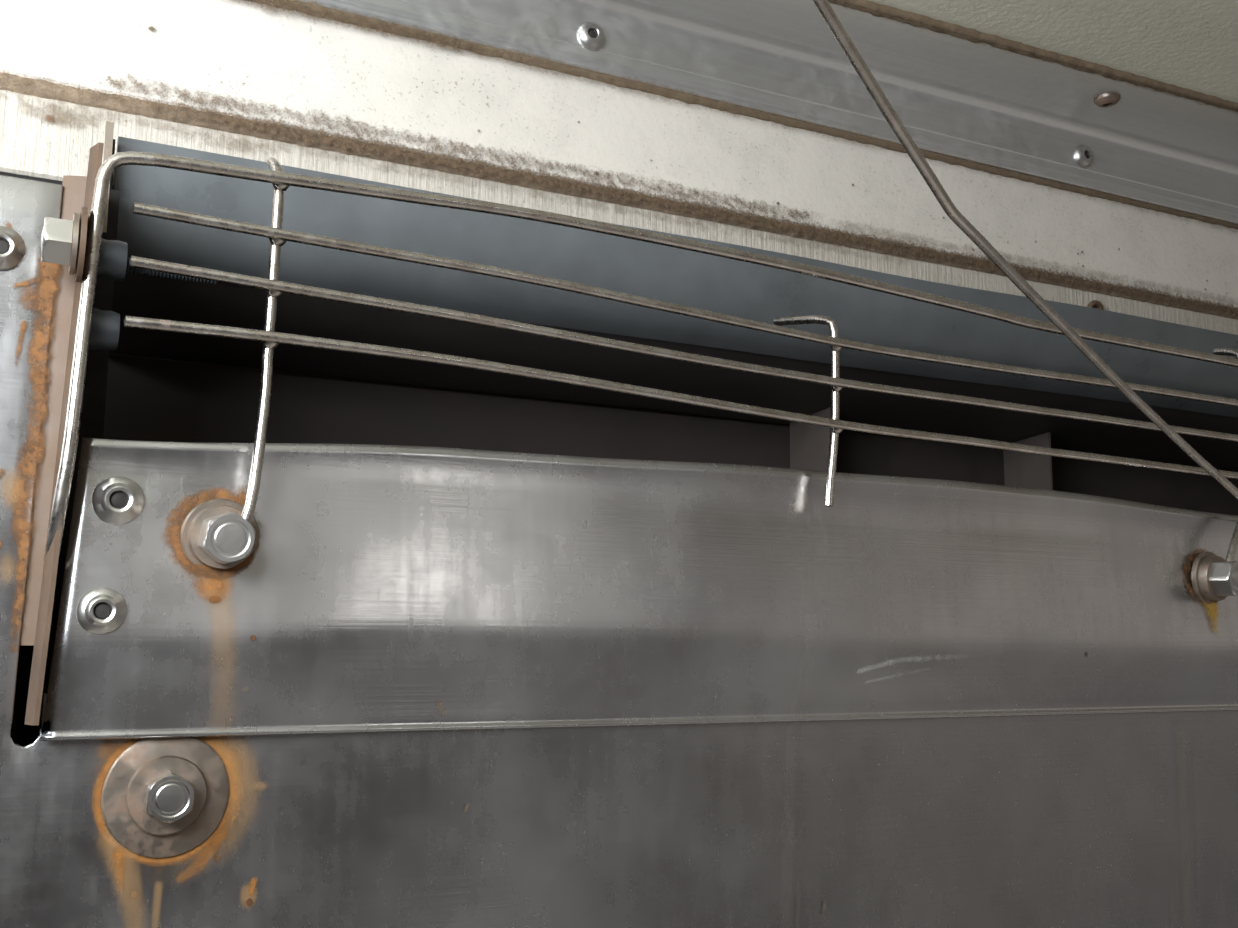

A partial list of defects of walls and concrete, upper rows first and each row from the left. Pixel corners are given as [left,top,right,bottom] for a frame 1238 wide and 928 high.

damp [106,74,1238,315]
corrosion [0,258,62,650]
corrosion [166,489,259,603]
corrosion [1185,549,1218,629]
corrosion [93,736,241,870]